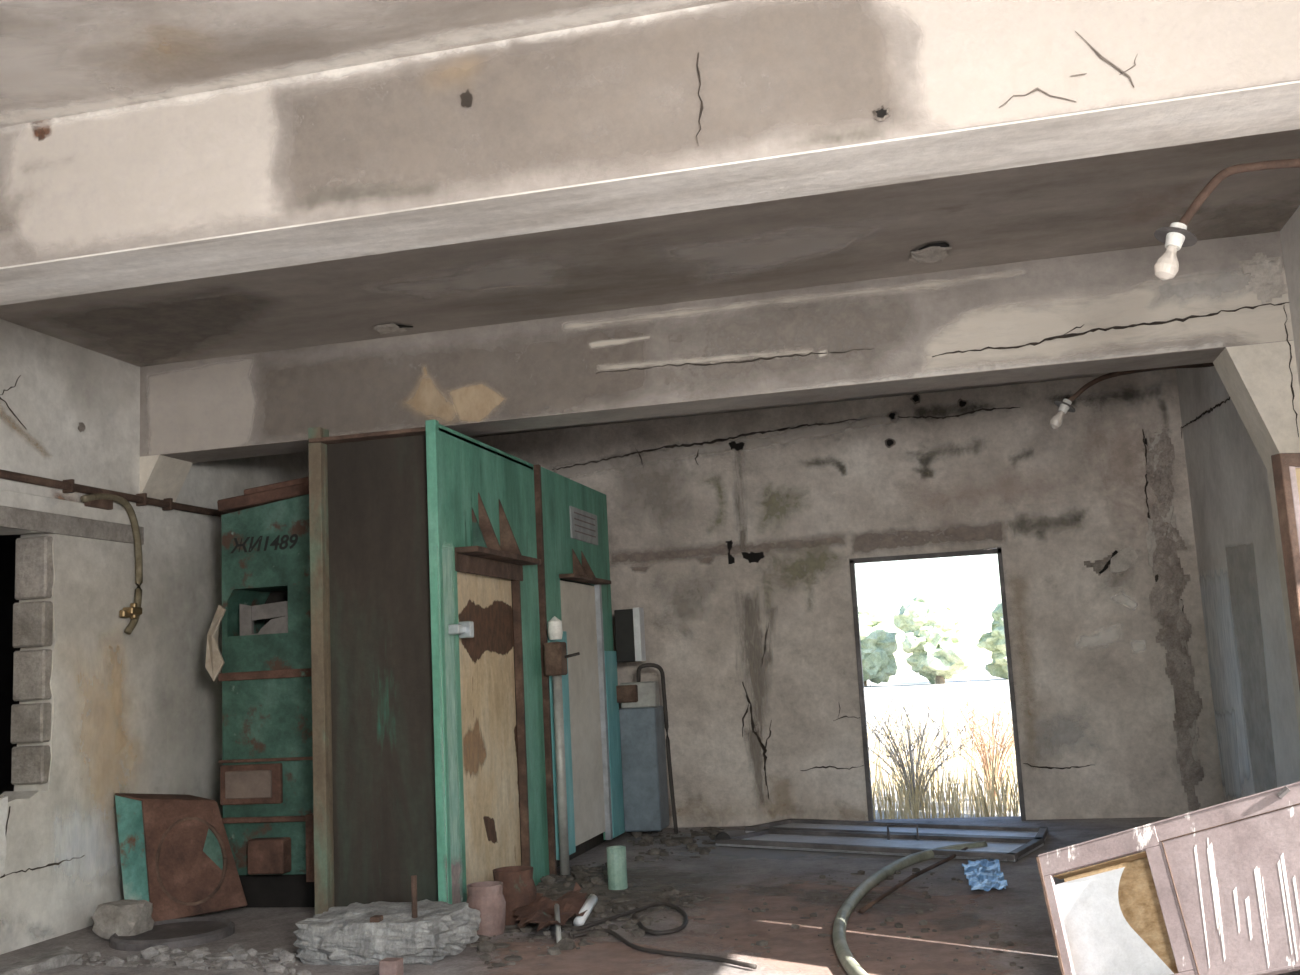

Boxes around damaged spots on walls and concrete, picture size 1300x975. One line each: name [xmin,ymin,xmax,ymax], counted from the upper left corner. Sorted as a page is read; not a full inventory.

crack [999,31,1137,108]
crack [695,52,703,146]
rust [31,119,51,141]
crack [932,302,1299,439]
crack [0,375,26,429]
crack [898,407,1020,419]
crack [552,418,866,470]
flaking render [1079,428,1204,811]
crack [742,622,772,799]
crack [800,764,864,772]
crack [0,855,85,878]